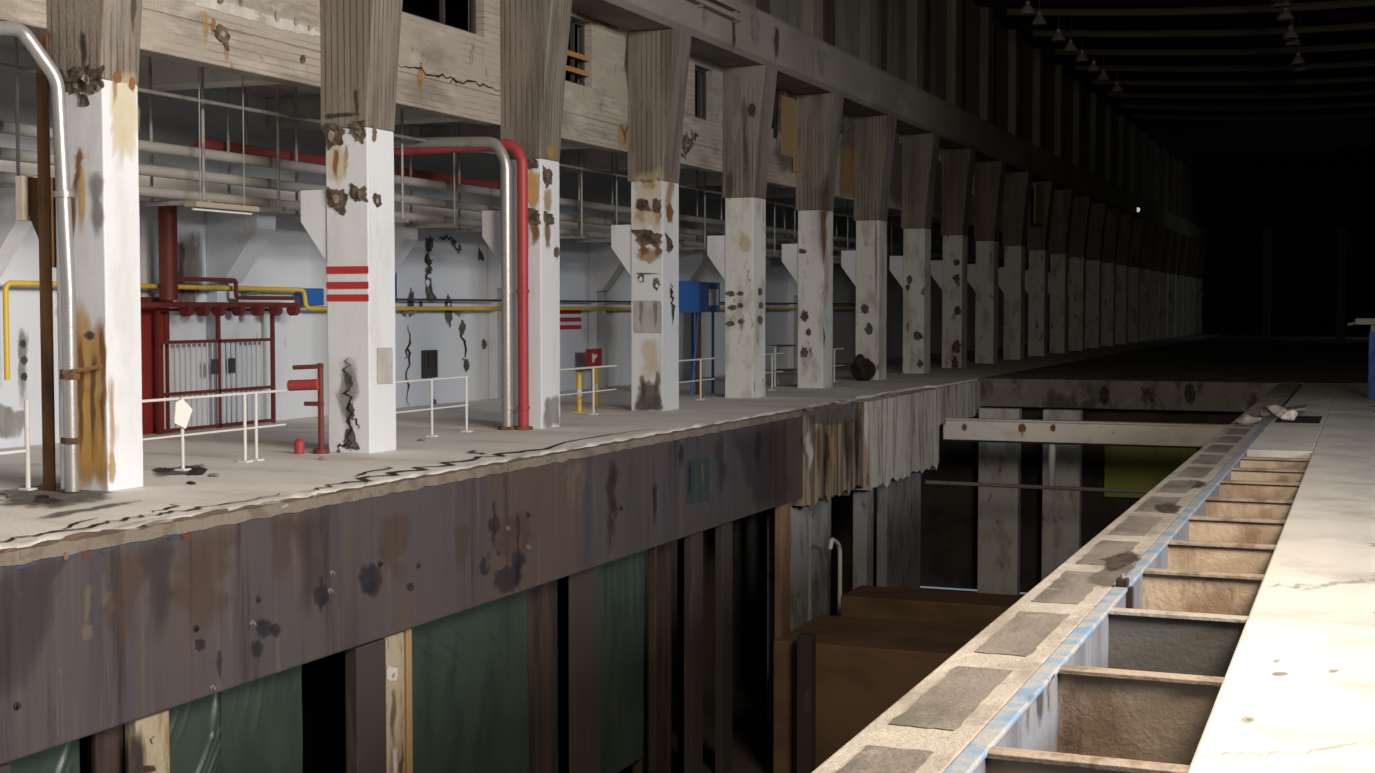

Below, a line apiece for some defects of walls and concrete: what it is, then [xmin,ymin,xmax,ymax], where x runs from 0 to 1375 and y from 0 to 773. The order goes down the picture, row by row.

crack [398,63,501,91]
corrosion [333,147,348,173]
spalling [326,183,382,215]
corrosion [527,144,560,258]
corrosion [76,313,116,481]
damp [480,503,525,592]
damp [360,564,380,595]
damp [253,620,279,656]